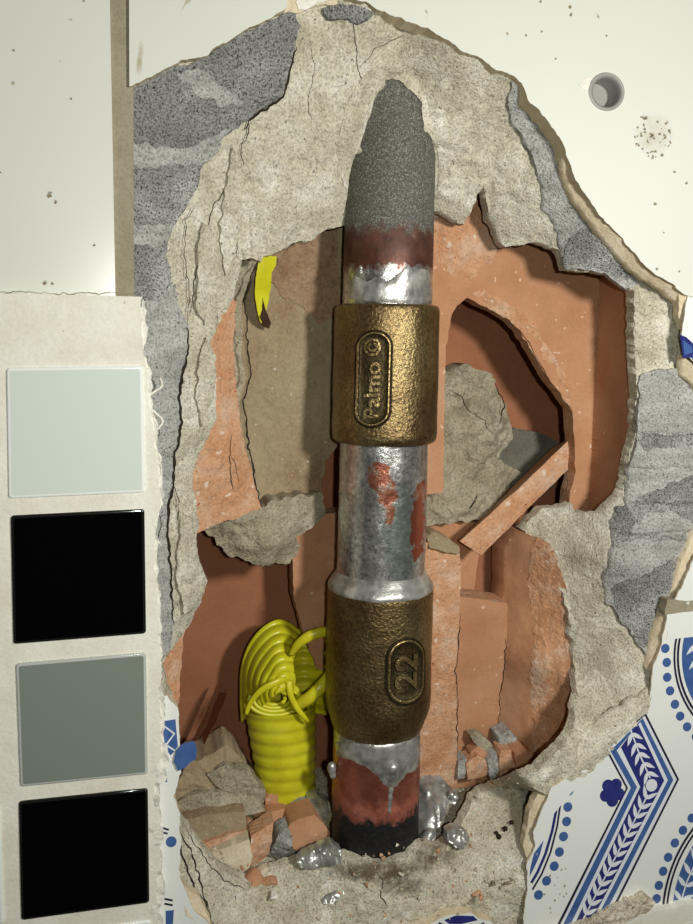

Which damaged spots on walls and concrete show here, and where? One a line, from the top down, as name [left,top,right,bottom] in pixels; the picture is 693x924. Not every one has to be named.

spalling [284,0,337,14]
peeling [579,78,593,92]
peeling [153,409,164,431]
spalling [179,81,693,924]
spalling [163,634,184,704]
spalling [159,690,212,924]